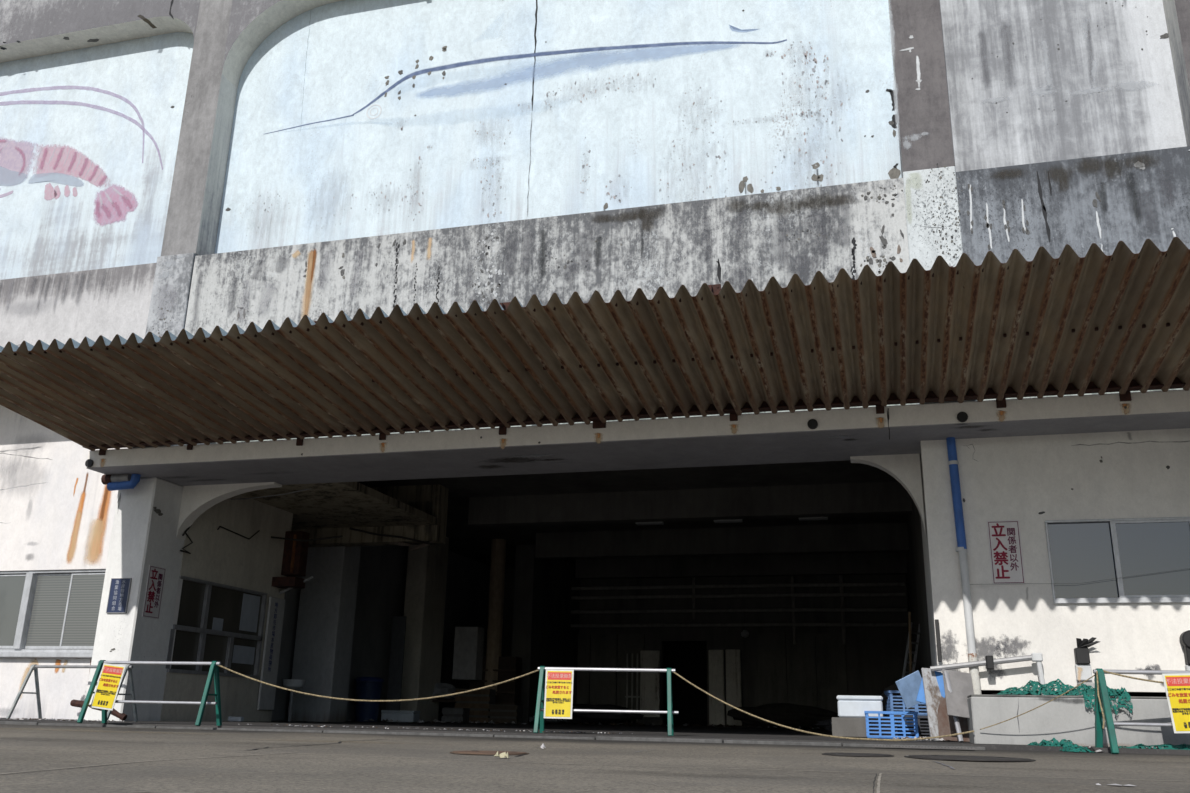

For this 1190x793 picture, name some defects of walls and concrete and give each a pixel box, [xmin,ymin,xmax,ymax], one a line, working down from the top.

crack [527,0,538,216]
rust [293,250,316,315]
rust [67,473,111,561]